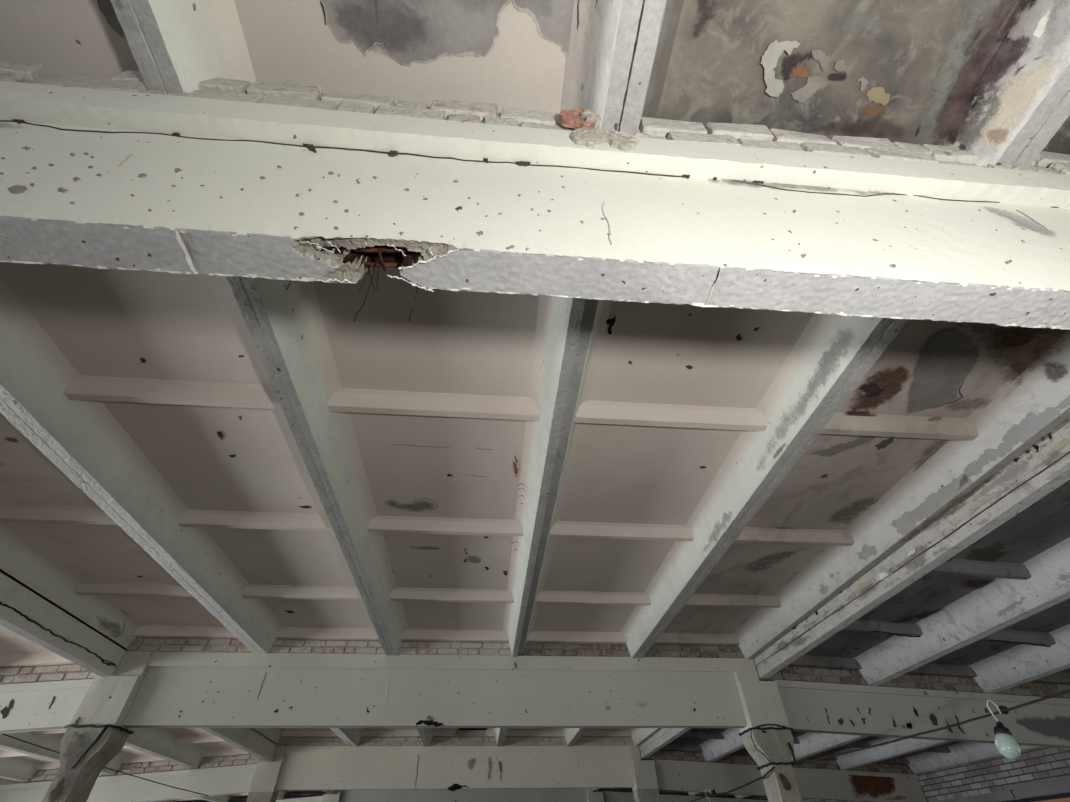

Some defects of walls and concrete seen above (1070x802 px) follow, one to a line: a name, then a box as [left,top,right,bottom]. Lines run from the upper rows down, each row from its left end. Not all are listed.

peeling [94,0,125,38]
peeling [319,0,579,66]
peeling [760,40,890,116]
hole [7,183,34,194]
spalling [294,212,461,322]
water stain [847,367,909,417]
peeling [908,329,979,412]
water stain [957,323,1069,380]
peeling [891,395,1070,535]
spalling [0,699,14,719]
spalling [891,706,965,734]
corrosion [848,775,895,798]